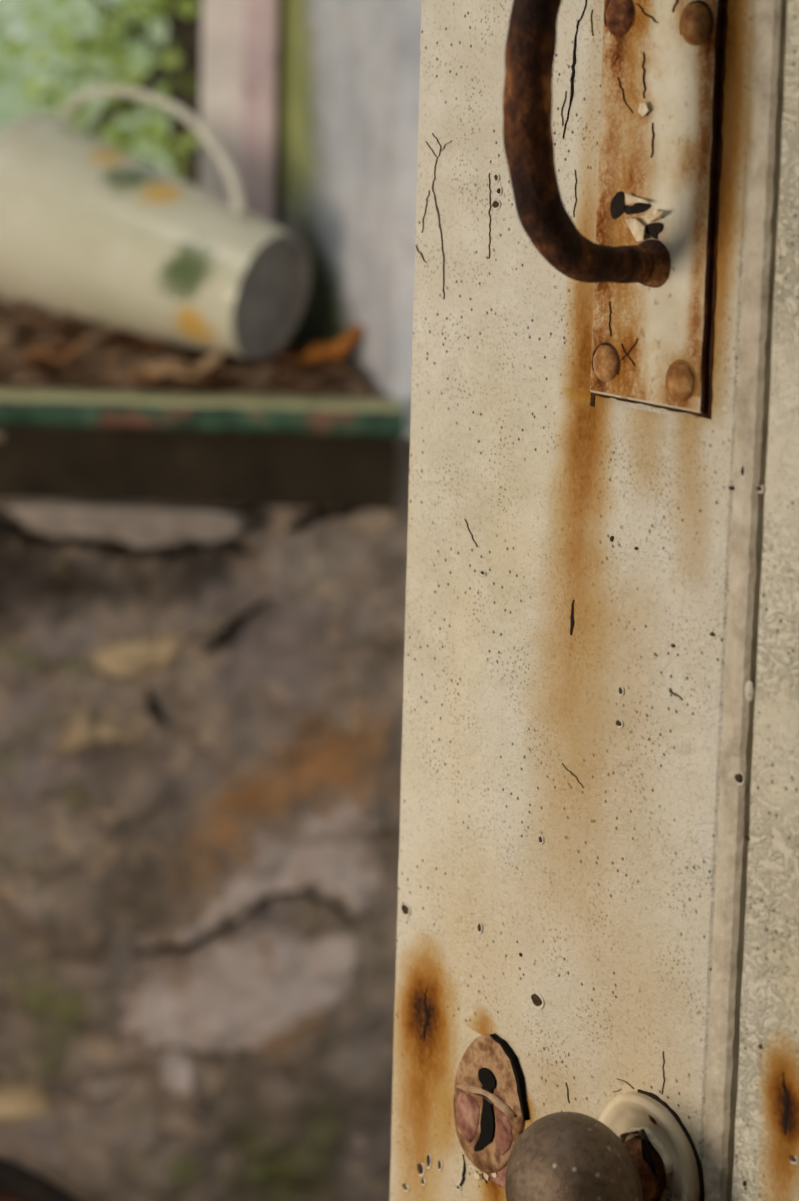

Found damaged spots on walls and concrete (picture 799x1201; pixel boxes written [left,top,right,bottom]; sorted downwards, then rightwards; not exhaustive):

crack [415,133,452,299]
crack [571,170,579,217]
crack [561,0,594,139]
corrosion [578,0,649,247]
crack [617,52,655,158]
crack [635,0,679,23]
corrosion [661,0,748,409]
crack [608,302,639,366]
corrosion [562,281,646,669]
corrosion [397,951,451,1190]
corrosion [483,1172,506,1201]
corrosion [764,1049,799,1201]